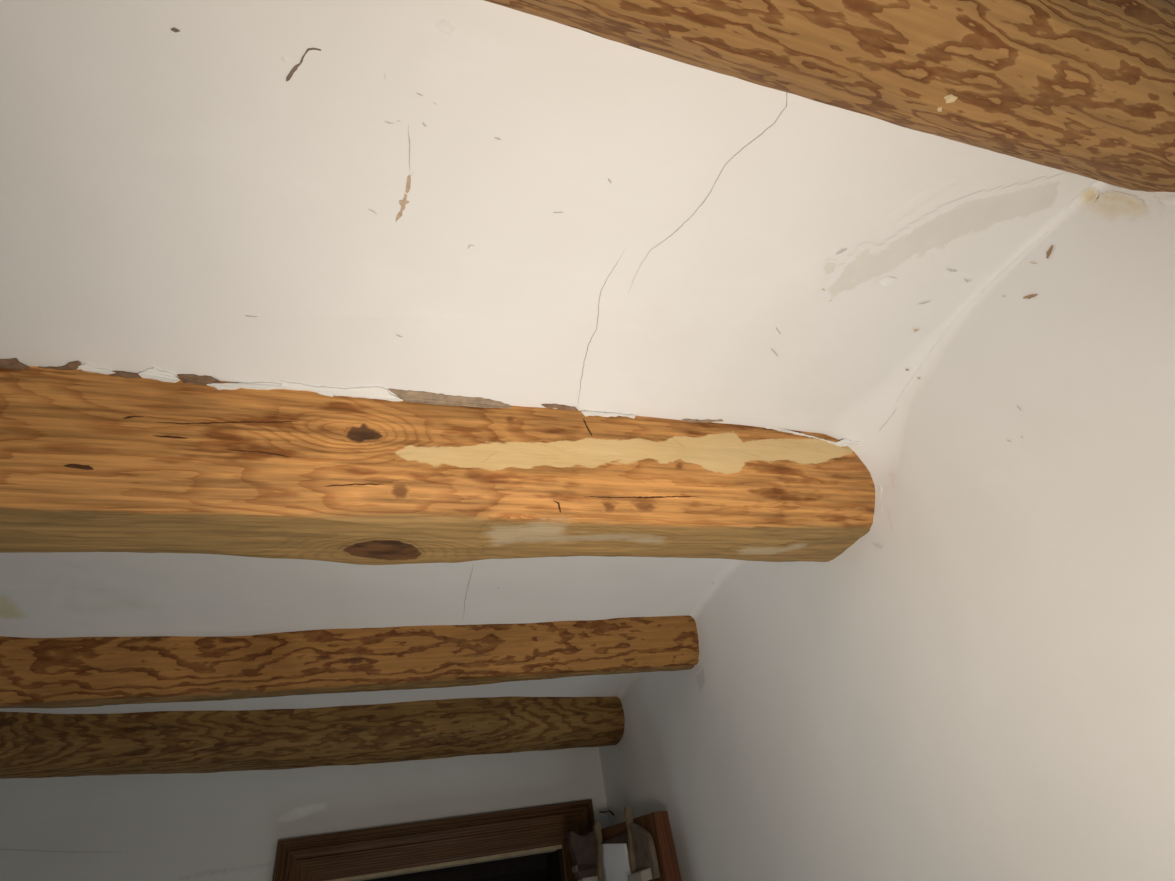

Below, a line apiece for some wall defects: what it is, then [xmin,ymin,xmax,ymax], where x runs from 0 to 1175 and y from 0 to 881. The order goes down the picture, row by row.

peeling [286,48,321,82]
peeling [396,124,414,221]
crack [578,93,787,402]
peeling [818,172,1072,303]
peeling [0,358,511,408]
peeling [541,404,636,419]
peeling [765,427,863,447]